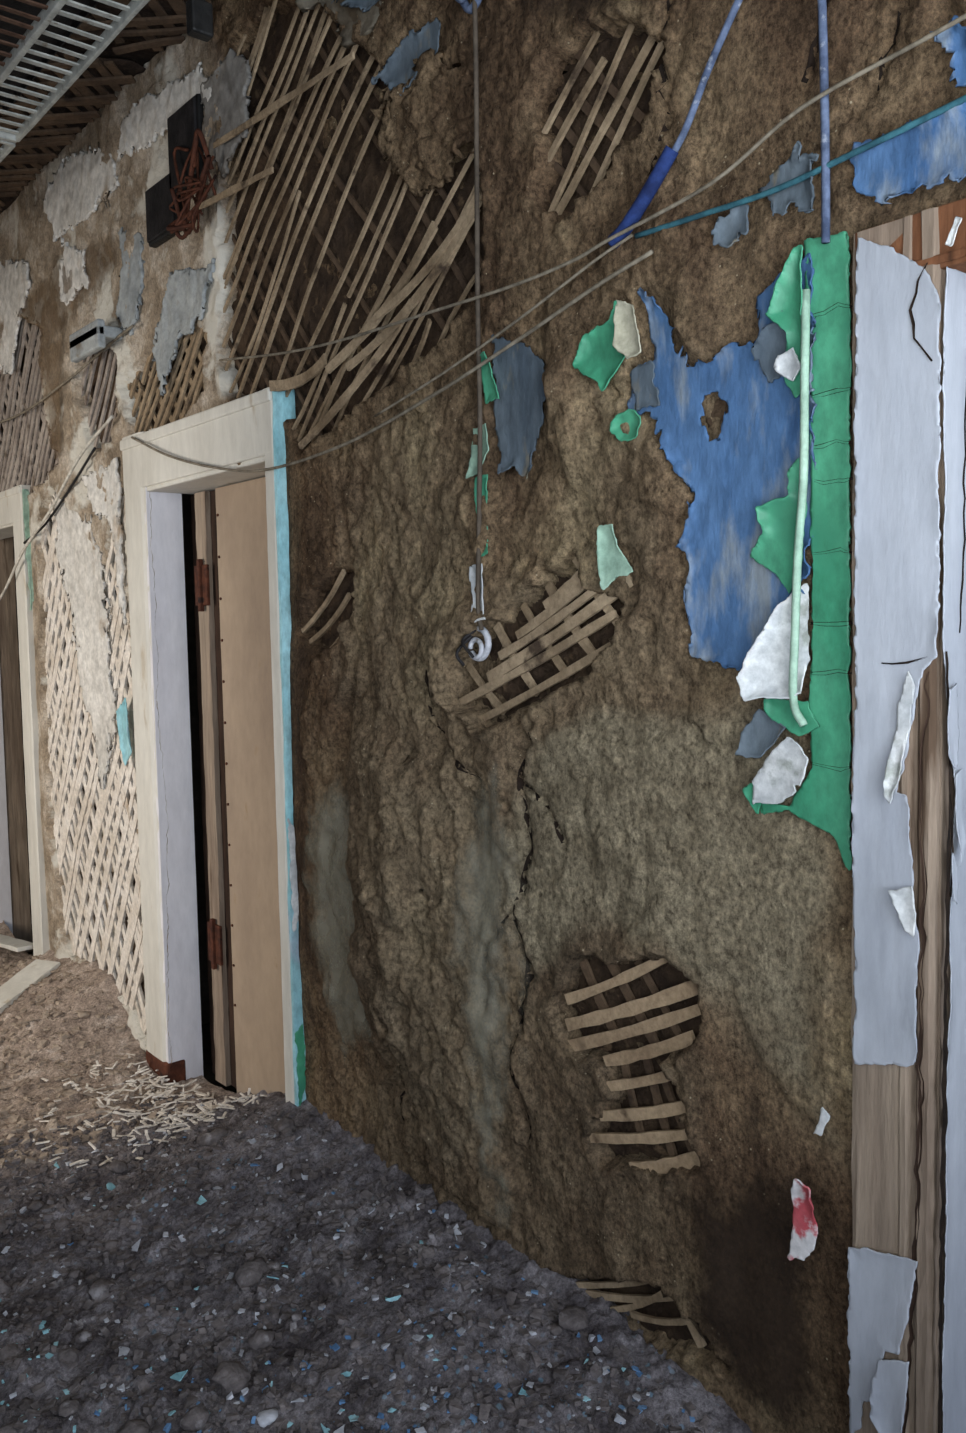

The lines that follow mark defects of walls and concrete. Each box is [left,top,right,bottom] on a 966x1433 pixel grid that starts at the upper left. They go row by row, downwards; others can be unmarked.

spalling [0,0,188,211]
spalling [81,0,484,449]
spalling [542,24,665,215]
peeling [711,141,819,248]
peeling [850,15,966,206]
peeling [945,216,962,247]
peeling [465,334,546,514]
spalling [0,317,147,1035]
crack [425,670,480,778]
spalling [459,524,633,722]
peeling [564,231,966,1433]
crack [482,732,564,1140]